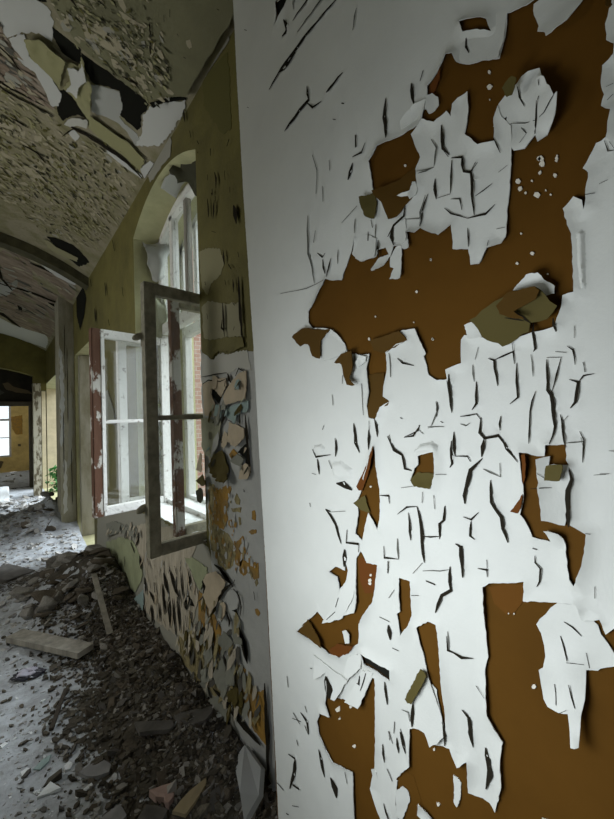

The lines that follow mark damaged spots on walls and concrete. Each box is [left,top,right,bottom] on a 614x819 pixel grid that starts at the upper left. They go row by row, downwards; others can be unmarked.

crack [269,0,336,89]
crack [284,72,344,132]
peeling [487,68,557,151]
peeling [352,164,418,279]
peeling [464,273,557,347]
crack [309,312,592,613]
peeling [521,454,570,549]
spalling [97,336,276,789]
crack [380,617,398,651]
peeling [405,669,444,751]
crack [446,631,473,659]
peeling [532,603,614,749]